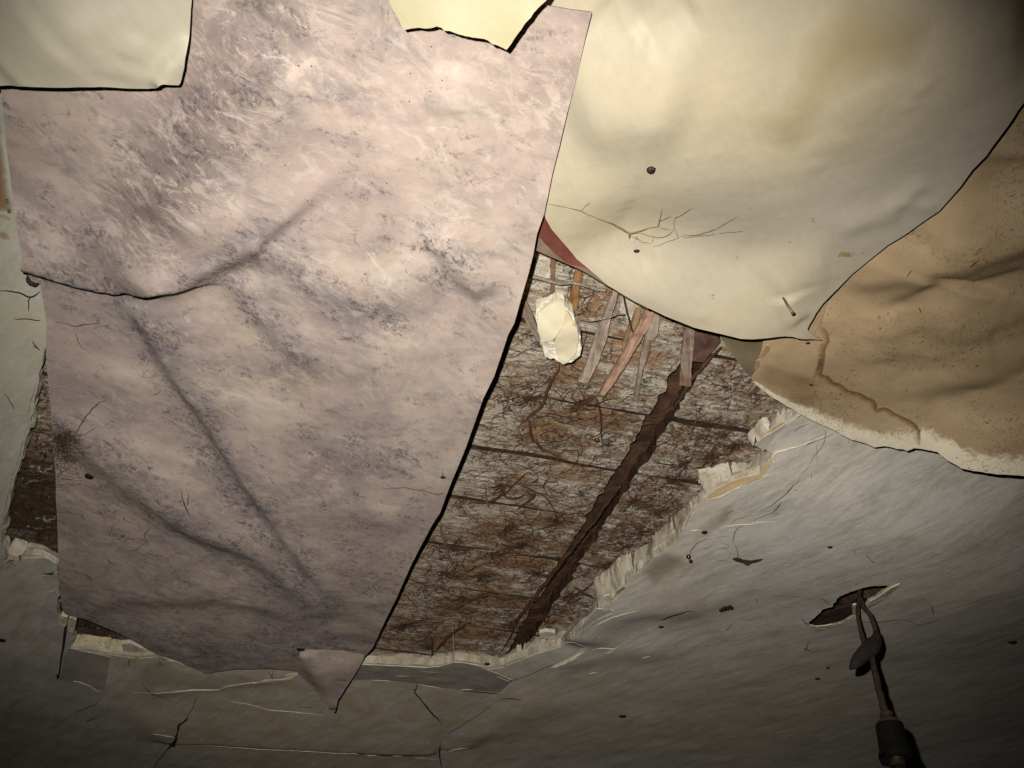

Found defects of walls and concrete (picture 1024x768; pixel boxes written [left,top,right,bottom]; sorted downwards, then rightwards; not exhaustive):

damp [819,334,920,436]
flaking render [0,361,60,587]
peeling [354,408,800,692]
flaking render [809,583,900,630]
crack [142,683,196,766]